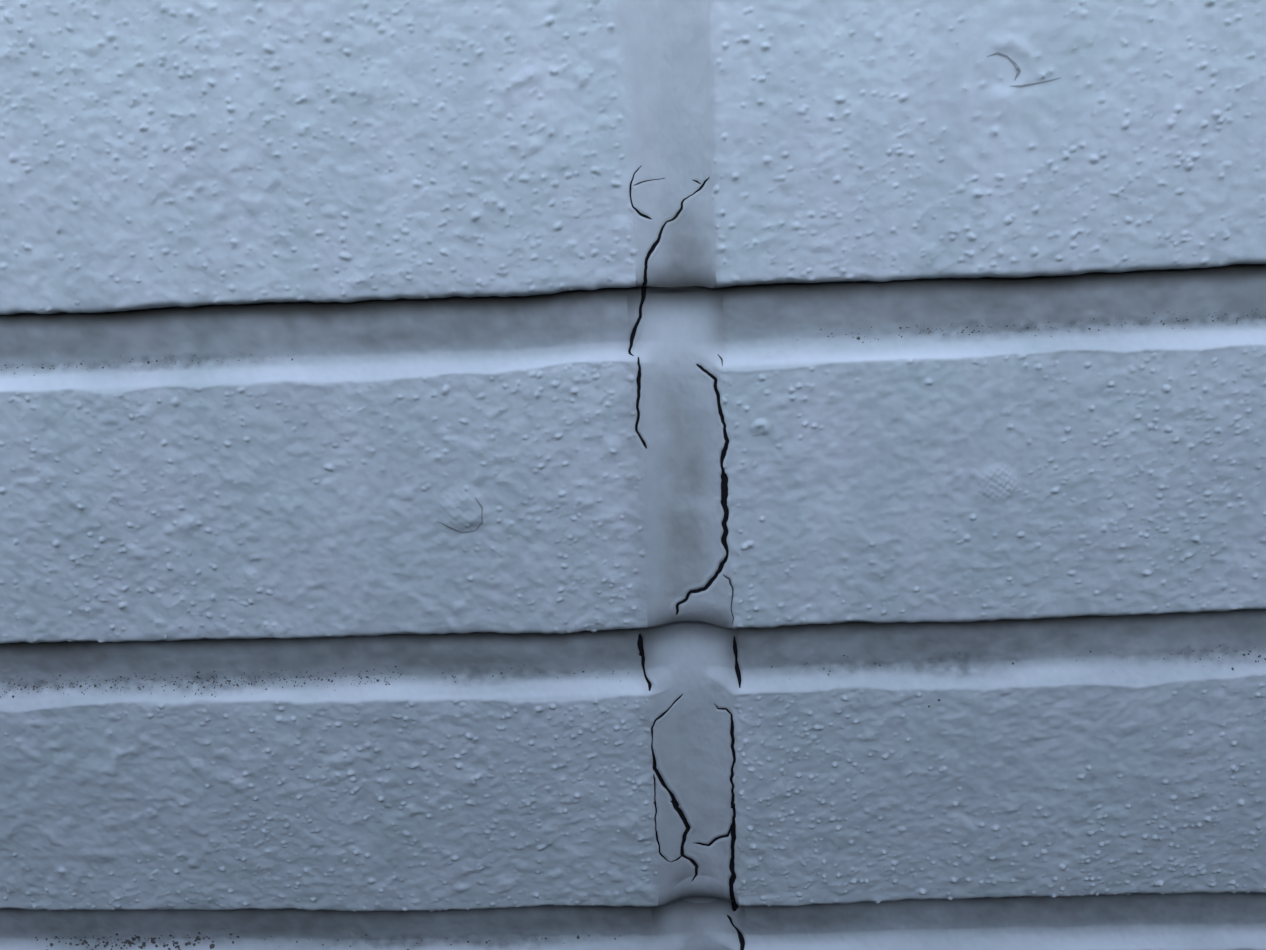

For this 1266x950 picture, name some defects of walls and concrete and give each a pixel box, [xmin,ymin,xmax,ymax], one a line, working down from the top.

crack [628,166,710,449]
crack [637,354,745,950]